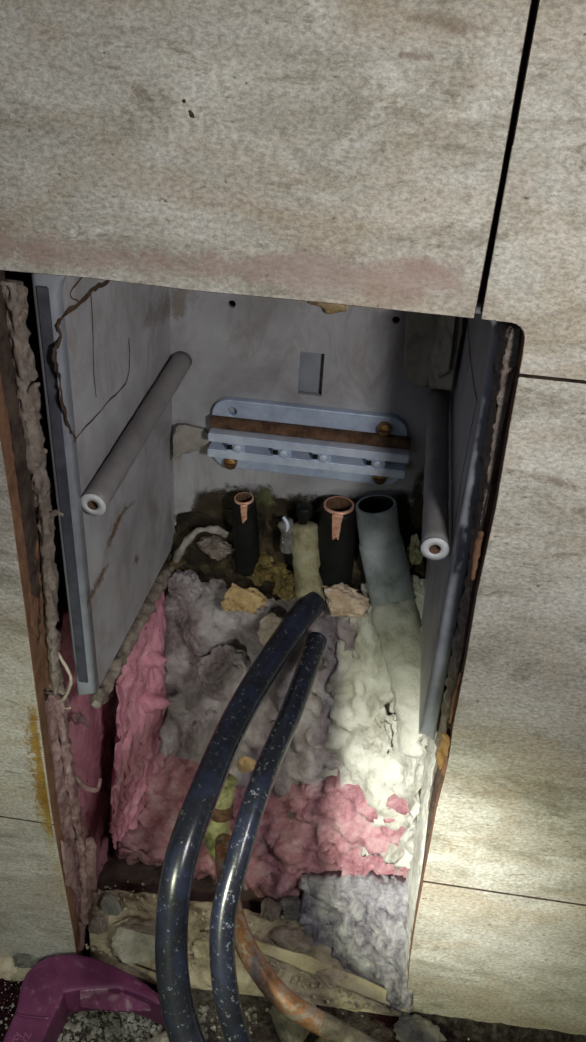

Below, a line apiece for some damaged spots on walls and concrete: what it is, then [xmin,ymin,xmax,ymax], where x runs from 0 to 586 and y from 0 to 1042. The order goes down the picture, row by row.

crack [54,277,130,442]
rust [24,707,53,835]